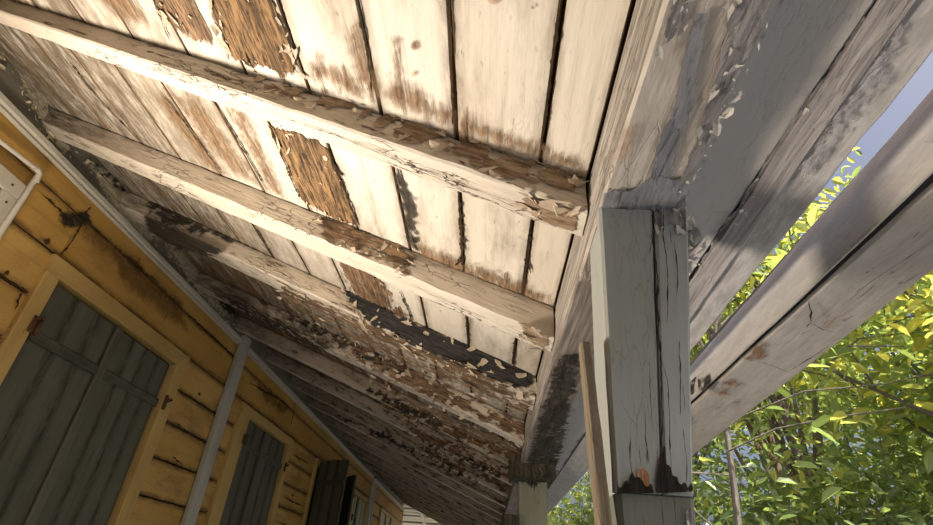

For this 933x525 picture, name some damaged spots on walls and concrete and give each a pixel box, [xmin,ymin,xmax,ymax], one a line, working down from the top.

peeling [0,50,78,159]
crack [38,191,234,357]
peeling [83,159,237,326]
peeling [268,125,417,278]
peeling [153,0,590,224]
peeling [275,261,540,497]
peeling [517,324,547,352]
crack [629,212,687,525]
peeling [654,0,866,275]